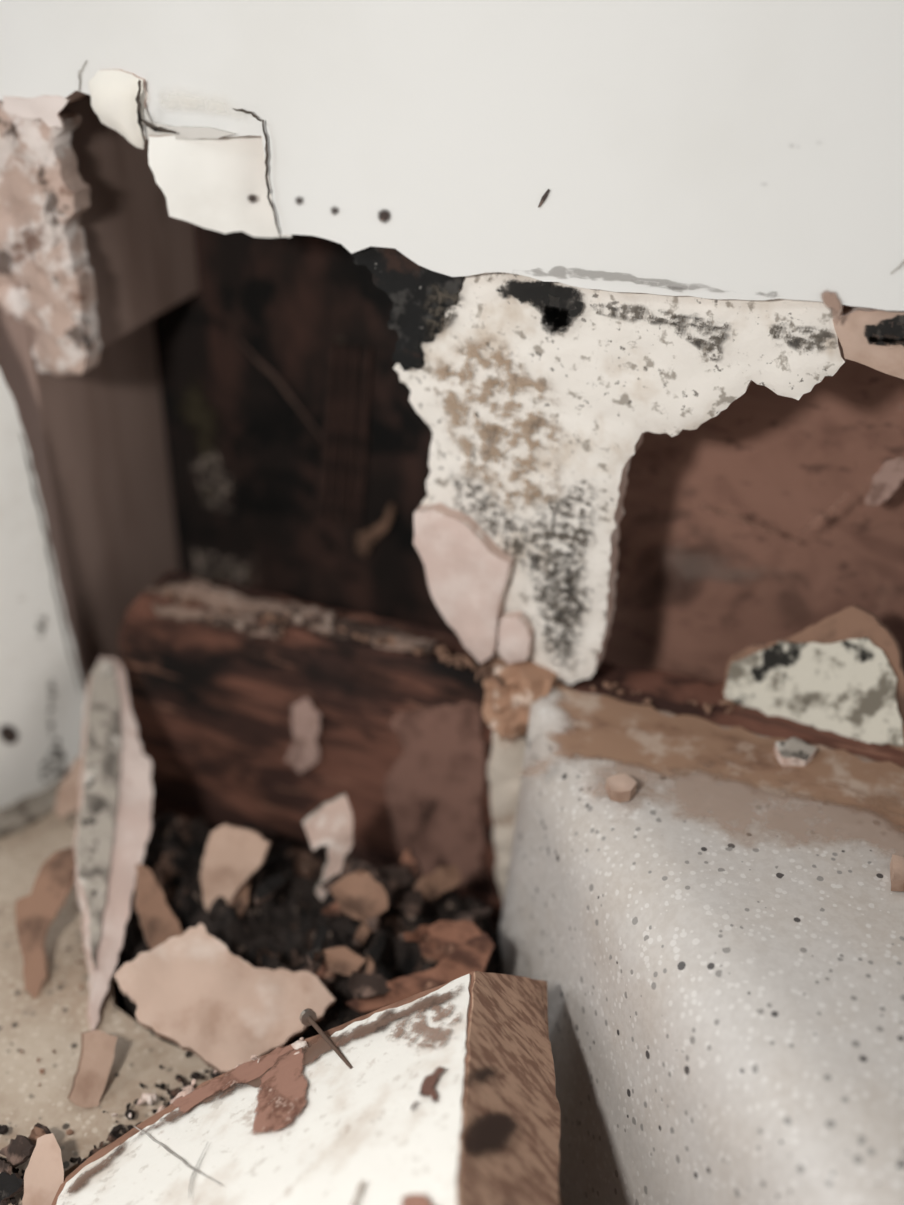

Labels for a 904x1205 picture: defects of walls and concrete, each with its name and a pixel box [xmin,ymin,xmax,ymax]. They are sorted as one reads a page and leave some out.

spalling [0,69,534,664]
damp [427,286,460,336]
mould [496,280,729,361]
mould [772,325,831,351]
spalling [821,291,904,379]
mould [864,315,904,346]
mould [435,342,592,666]
spalling [774,737,817,766]
peeling [54,756,82,819]
peeling [384,701,487,886]
spalling [606,773,637,803]